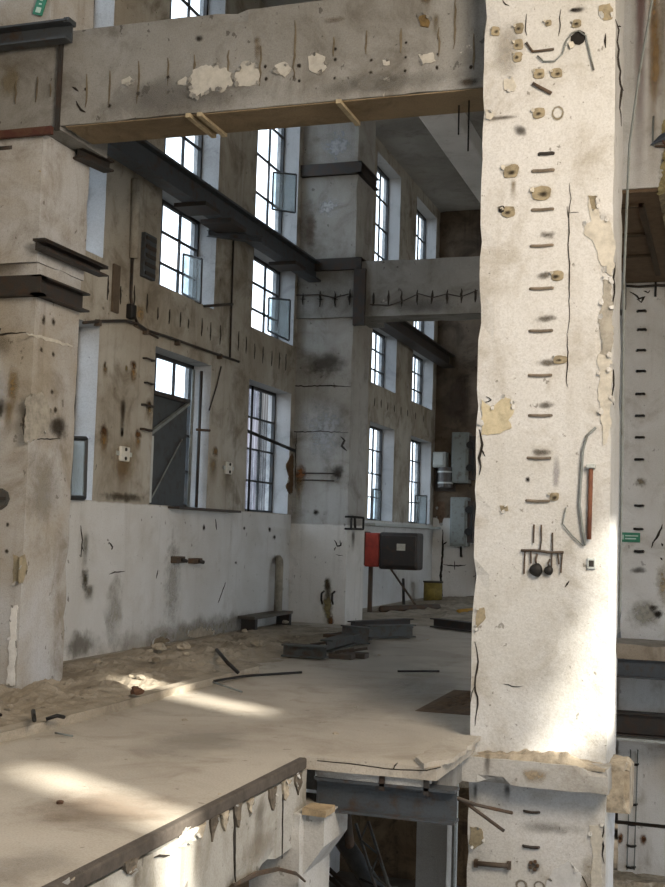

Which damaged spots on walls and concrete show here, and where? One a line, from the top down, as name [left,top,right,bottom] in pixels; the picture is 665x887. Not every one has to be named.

peeling [176,61,260,101]
peeling [272,62,292,77]
peeling [308,52,329,75]
crack [604,19,624,126]
crack [0,328,73,347]
peeling [477,394,515,435]
crack [477,430,485,475]
crack [470,643,479,724]
spalling [268,772,303,811]
spalling [196,797,256,842]